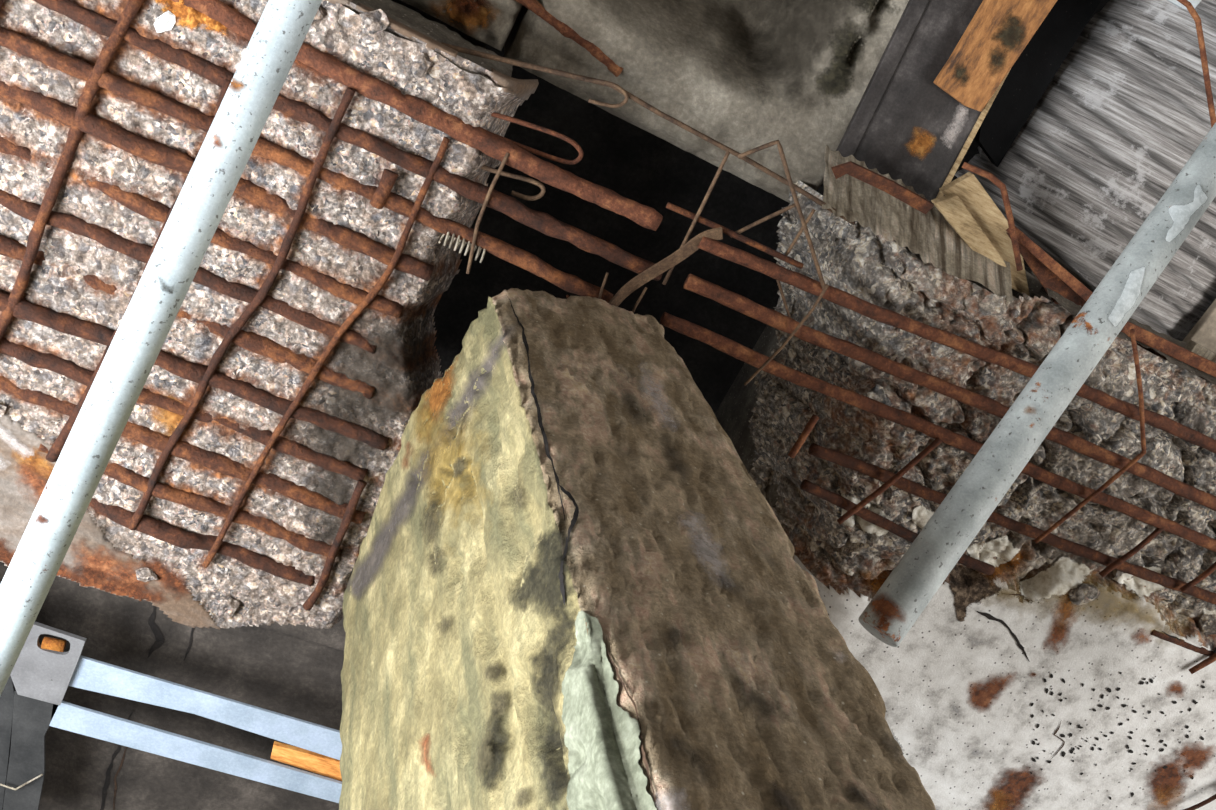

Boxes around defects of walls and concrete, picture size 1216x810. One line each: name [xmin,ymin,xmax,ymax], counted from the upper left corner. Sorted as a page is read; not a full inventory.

rust [154,0,250,45]
water stain [736,0,894,97]
spalling [0,0,268,462]
peeling [1165,184,1208,242]
spalling [87,0,663,629]
spalling [660,180,1076,601]
rust [17,449,53,500]
crack [507,296,579,607]
spalling [942,267,1216,674]
rust [970,675,1012,710]
rust [986,767,1039,810]
rust [1148,746,1212,810]